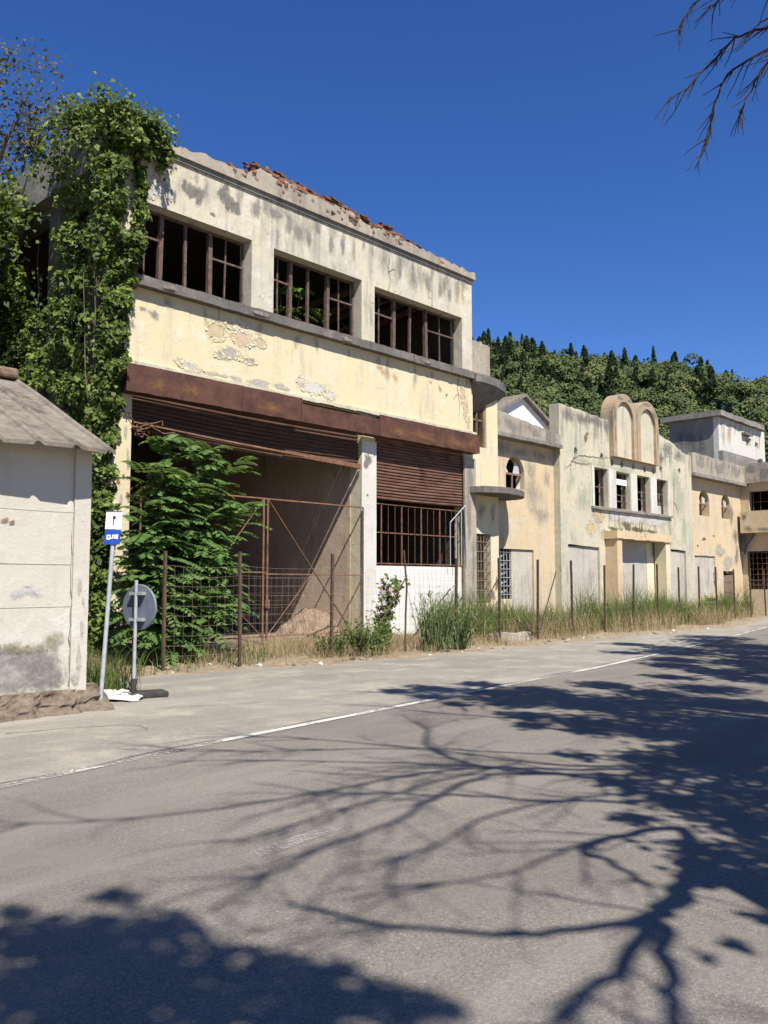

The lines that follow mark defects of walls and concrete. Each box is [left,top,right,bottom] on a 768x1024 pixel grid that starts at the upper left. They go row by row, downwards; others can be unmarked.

damp [173,180,240,217]
flaking render [226,162,409,245]
peeling [205,310,270,349]
peeling [173,356,209,376]
damp [609,511,686,535]